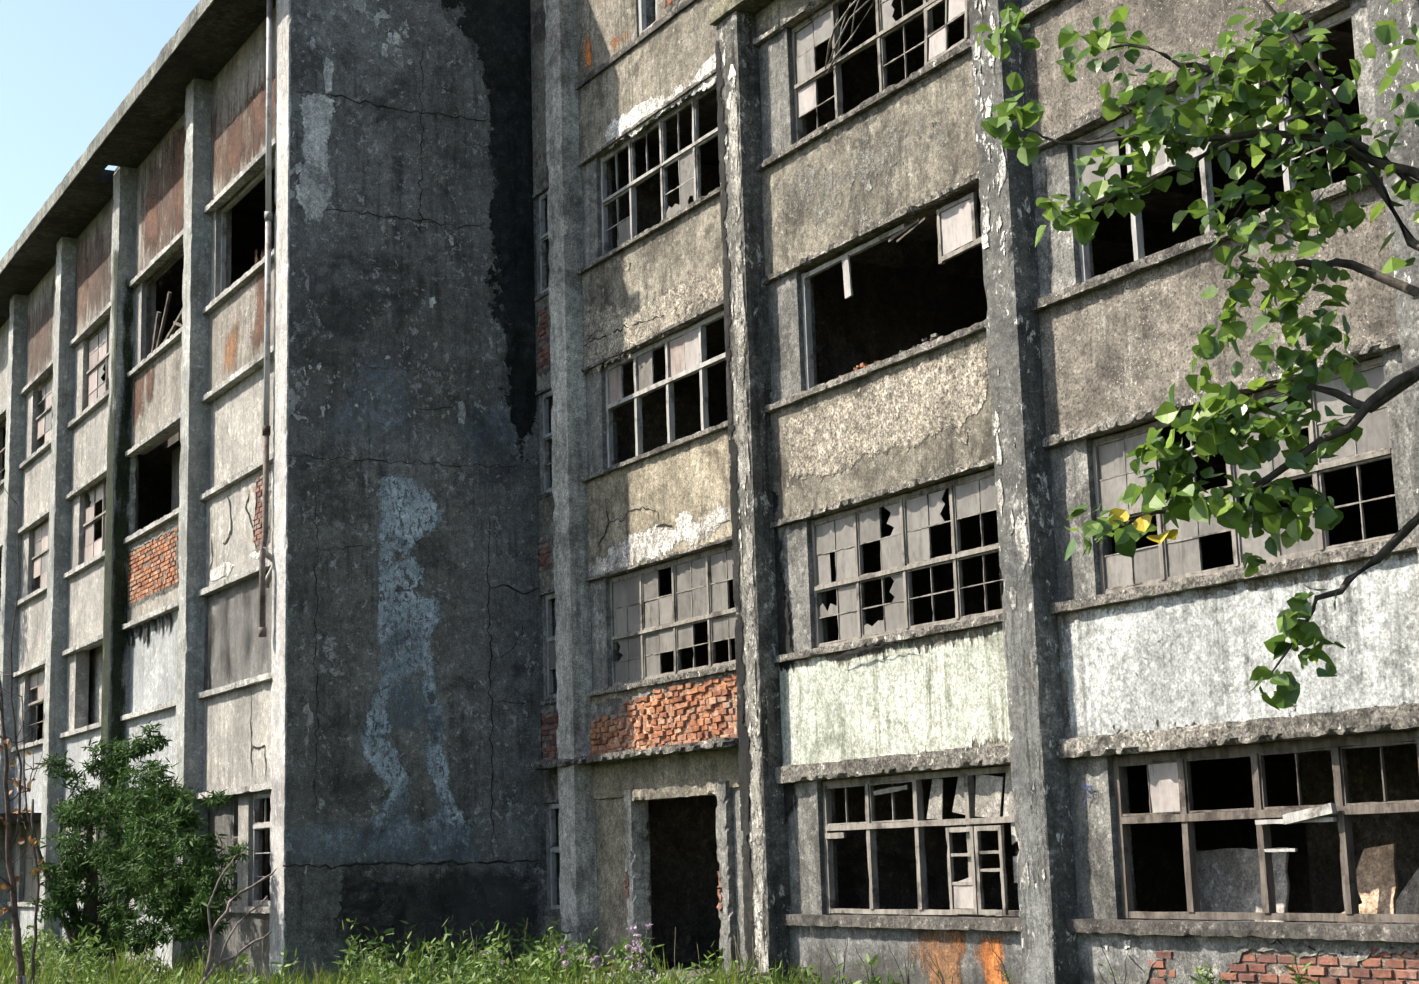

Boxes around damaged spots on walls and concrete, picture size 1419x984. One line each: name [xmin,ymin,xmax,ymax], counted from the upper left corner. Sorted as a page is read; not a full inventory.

flaking render [329,0,413,69]
rust [136,126,186,274]
rust [210,56,276,197]
peeling [295,30,337,223]
crack [299,51,488,235]
flaking render [385,352,466,424]
leakage [109,250,170,760]
flaking render [127,525,179,610]
crack [597,506,672,547]
flaking render [582,50,769,981]
rust [913,930,1007,984]
flaking render [1121,939,1419,984]